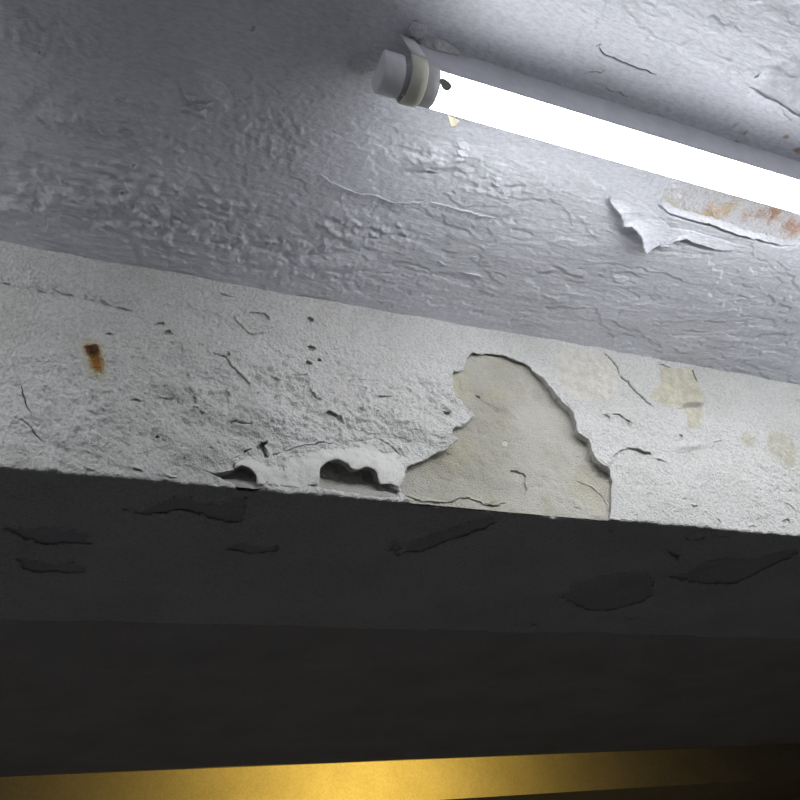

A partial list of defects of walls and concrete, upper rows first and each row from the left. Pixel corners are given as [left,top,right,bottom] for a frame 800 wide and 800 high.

crack [582,44,658,100]
spalling [610,183,800,255]
rust [691,194,800,240]
rust [70,332,118,386]
crack [603,352,654,409]
spalling [204,343,621,521]